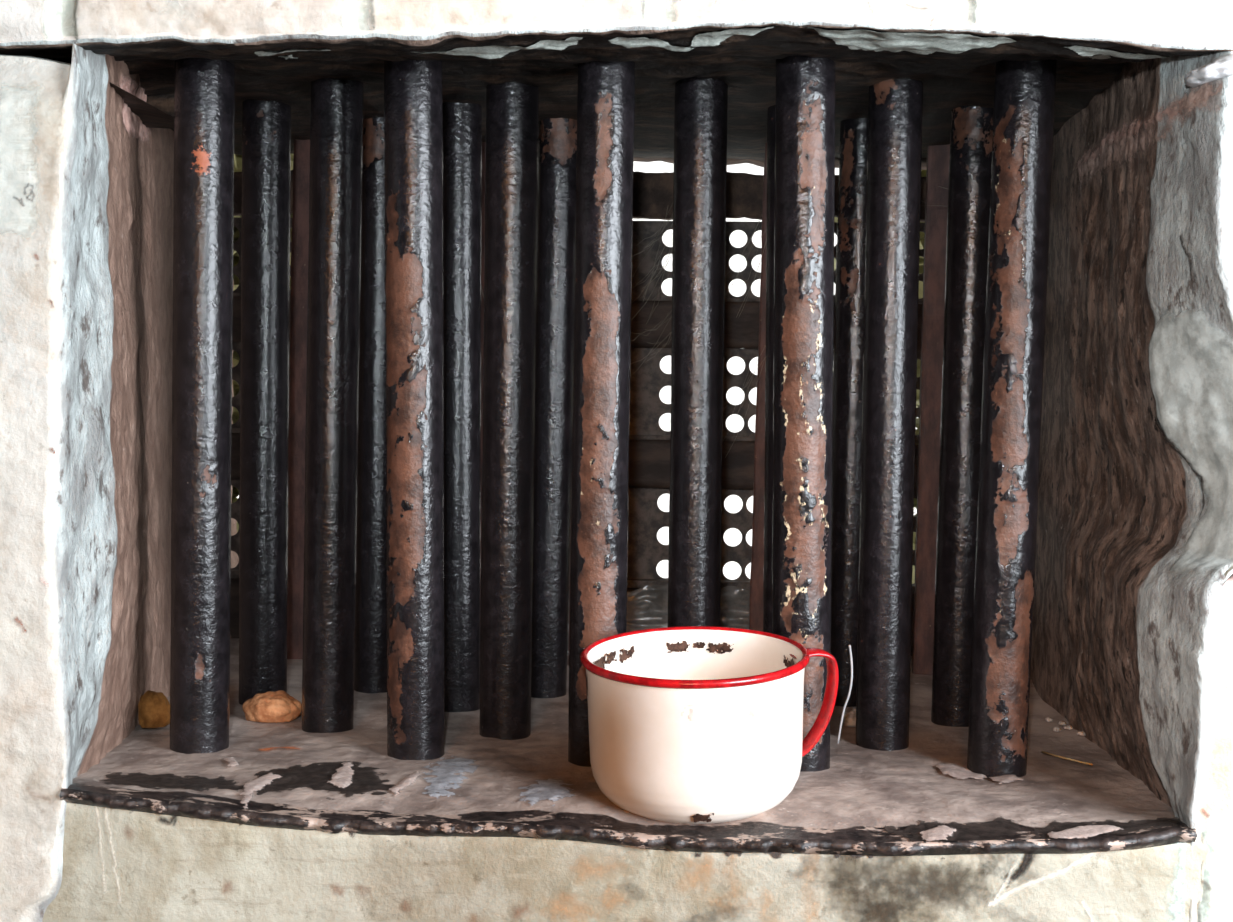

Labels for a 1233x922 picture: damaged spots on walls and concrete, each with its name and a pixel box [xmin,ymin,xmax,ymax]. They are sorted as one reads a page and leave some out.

peeling [102,756,479,809]
peeling [518,779,574,806]
peeling [692,813,714,823]
peeling [884,816,1183,842]